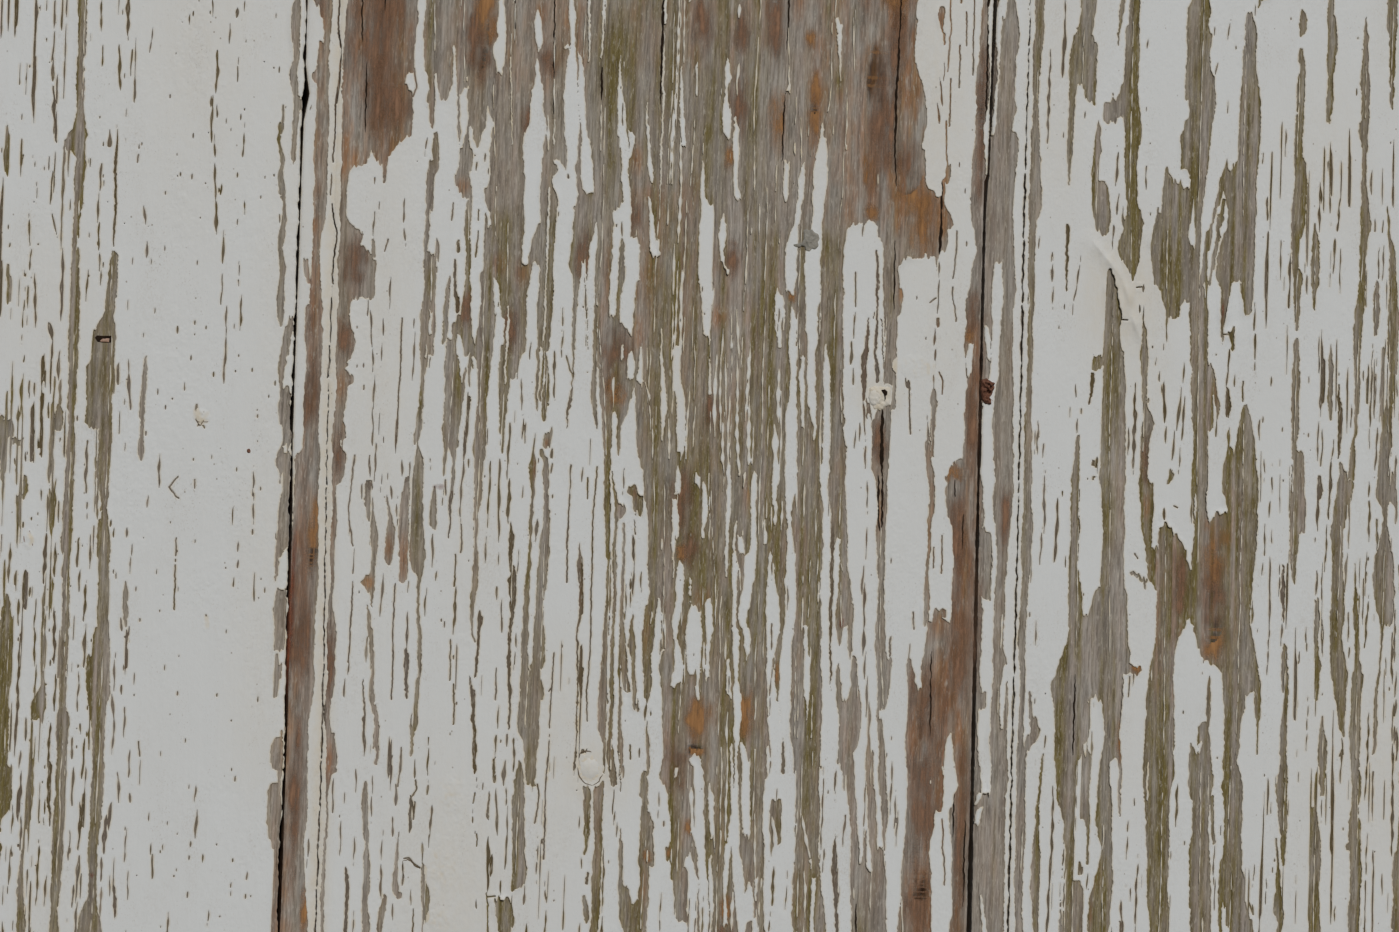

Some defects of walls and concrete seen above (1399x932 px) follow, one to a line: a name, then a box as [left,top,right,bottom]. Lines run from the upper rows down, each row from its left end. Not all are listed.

peeling [0,0,128,932]
peeling [138,356,147,461]
peeling [266,0,1263,932]
peeling [1289,10,1320,584]
peeling [1326,0,1337,124]
peeling [1308,19,1399,932]
peeling [1387,0,1397,110]
peeling [1273,644,1288,932]